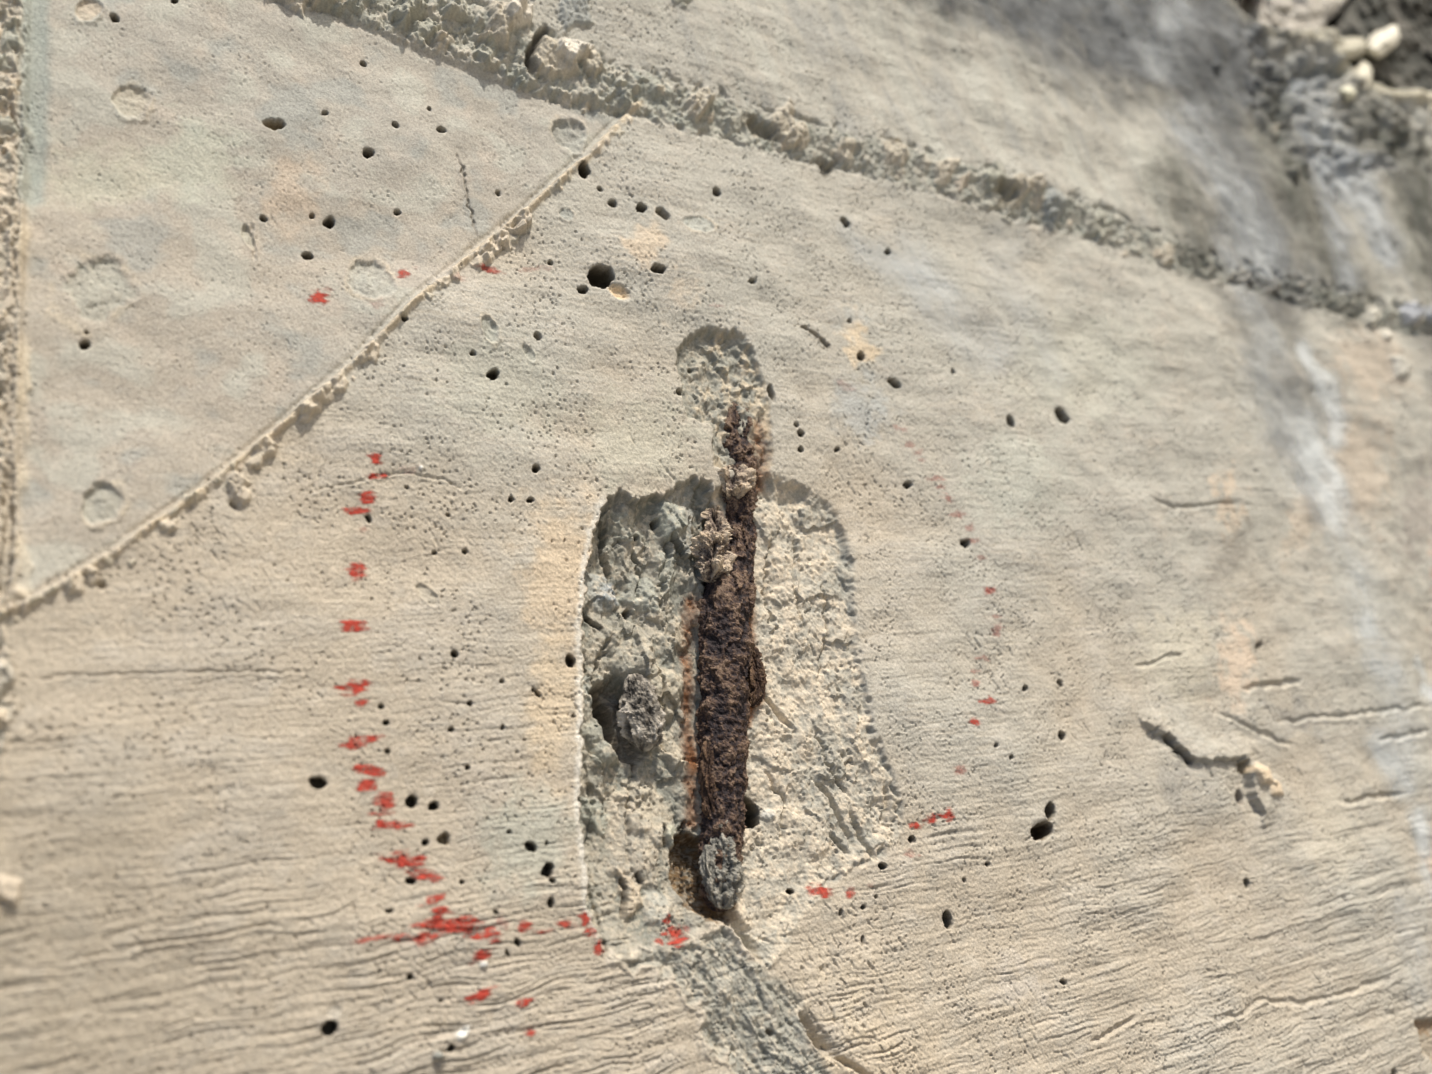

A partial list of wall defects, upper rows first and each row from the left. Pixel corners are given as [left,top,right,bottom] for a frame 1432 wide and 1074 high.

spalling [576,323,906,1074]
rust [746,646,767,722]